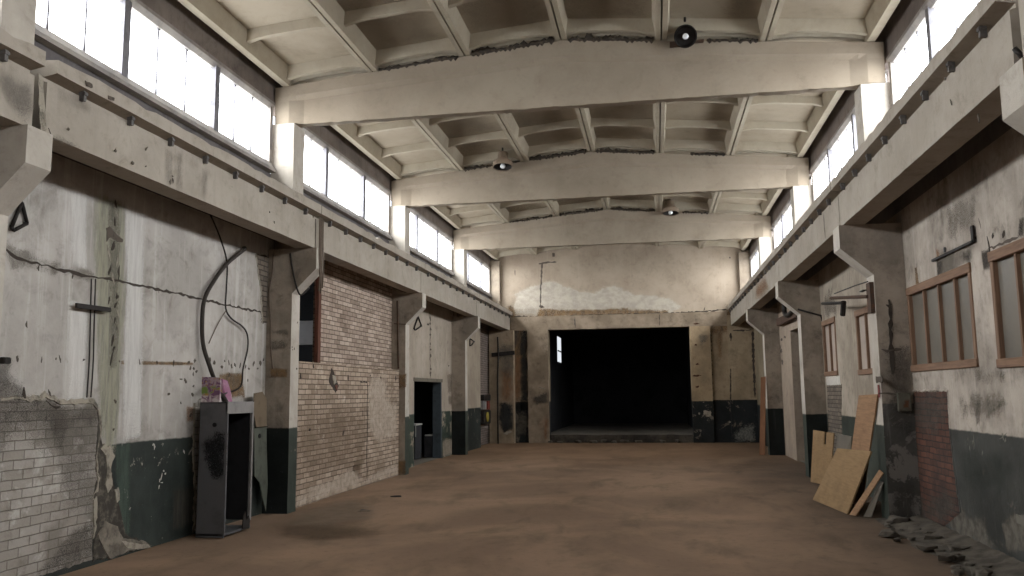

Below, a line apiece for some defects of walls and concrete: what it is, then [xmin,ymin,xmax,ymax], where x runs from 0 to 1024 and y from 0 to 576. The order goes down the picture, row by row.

spalling [0,358,151,576]
crack [6,243,262,321]
water stain [499,280,682,442]
spalling [826,376,842,456]
spalling [913,382,1024,553]
water stain [959,363,1008,425]